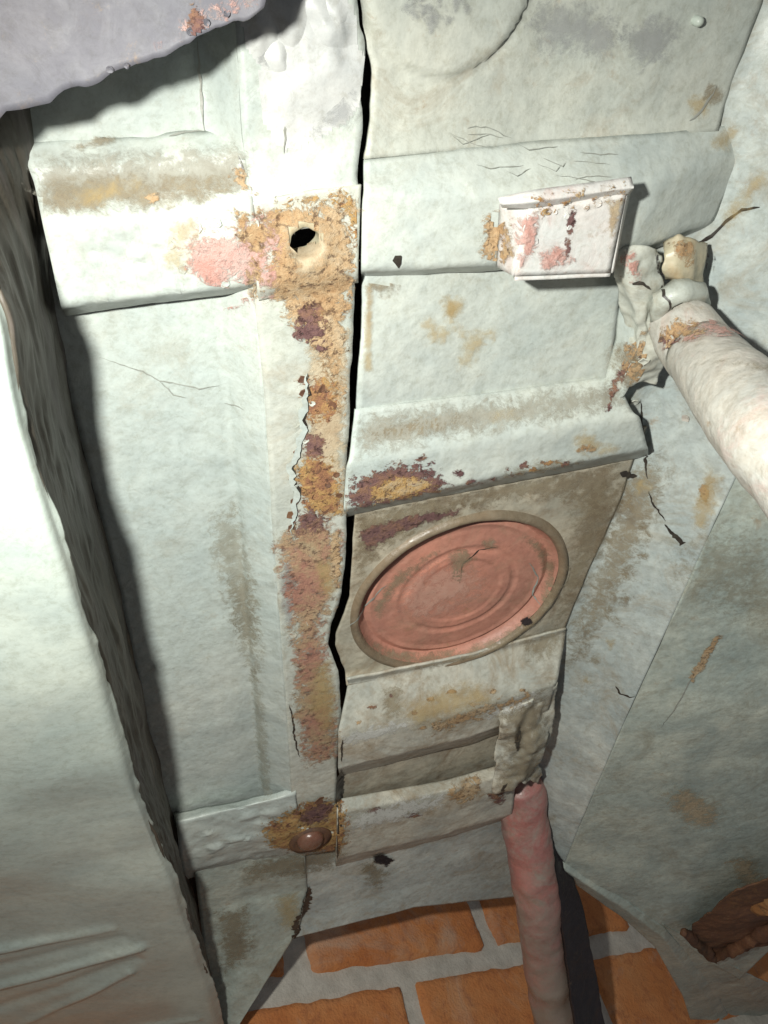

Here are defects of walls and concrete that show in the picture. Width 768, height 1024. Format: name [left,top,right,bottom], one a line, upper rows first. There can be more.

crack [449,126,612,182]
rust [228,156,360,417]
rust [480,210,514,263]
rust [668,240,696,268]
rust [604,317,745,412]
rust [345,444,596,510]
crack [620,400,686,546]
rust [259,774,506,857]
crack [291,887,313,939]